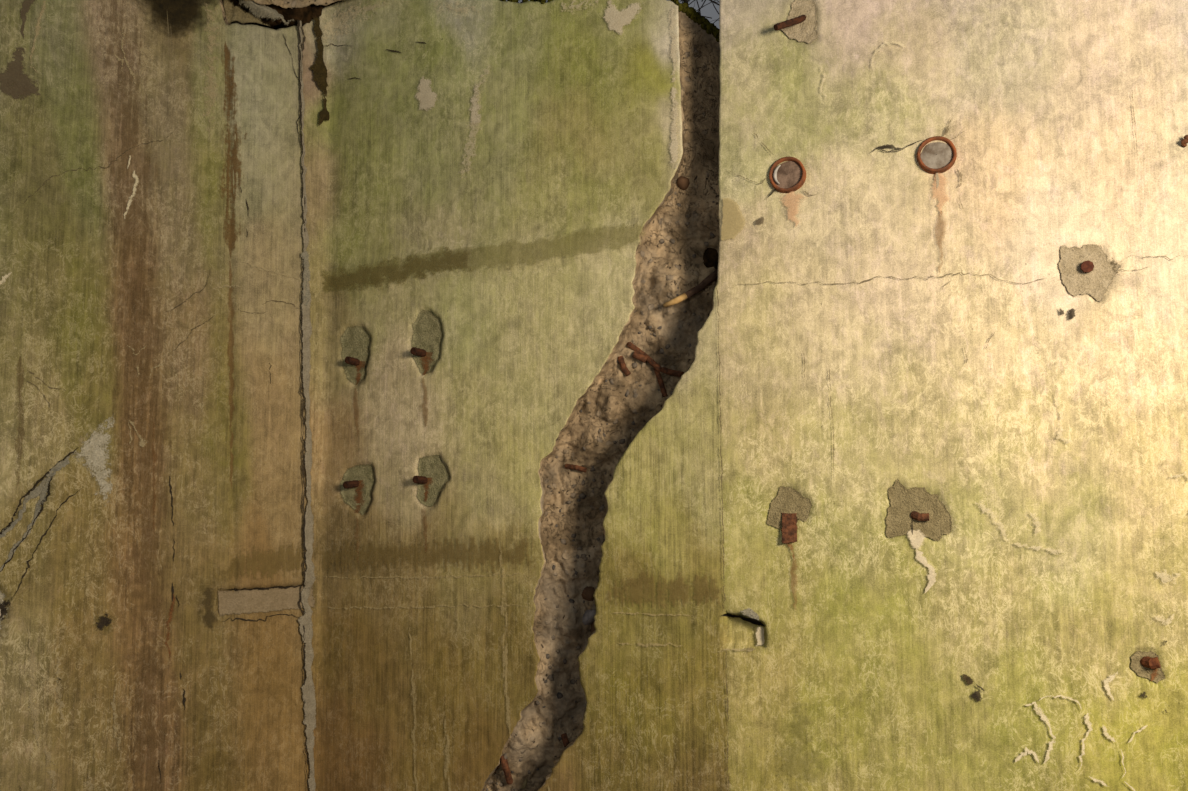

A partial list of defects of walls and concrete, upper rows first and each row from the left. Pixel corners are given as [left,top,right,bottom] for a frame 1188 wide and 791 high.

spalling [1058,244,1121,301]
crack [1110,255,1172,275]
crack [1060,308,1075,319]
crack [482,11,1041,791]
spalling [74,417,115,500]
spalling [885,479,952,541]
spalling [0,591,10,629]